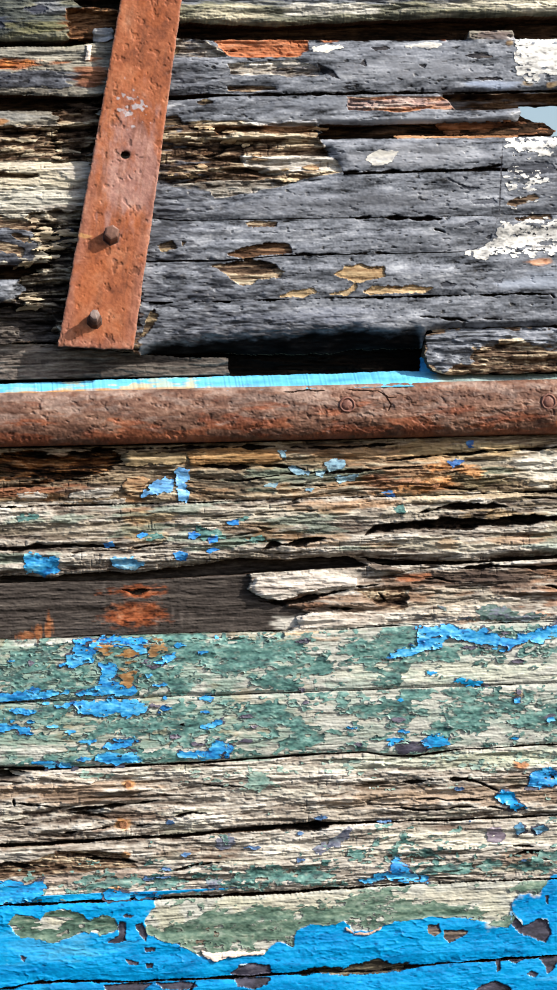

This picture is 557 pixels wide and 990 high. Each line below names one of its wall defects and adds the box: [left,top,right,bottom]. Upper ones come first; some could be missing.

peeling [514,38,557,83]
peeling [440,136,557,260]
peeling [212,242,292,286]
peeling [330,263,457,296]
peeling [141,467,190,503]
crack [124,443,557,535]
peeling [23,551,60,578]
corrosion [14,608,56,647]
corrosion [85,582,178,689]
peeling [0,604,557,990]
crack [396,777,504,812]
crack [1,980,118,990]